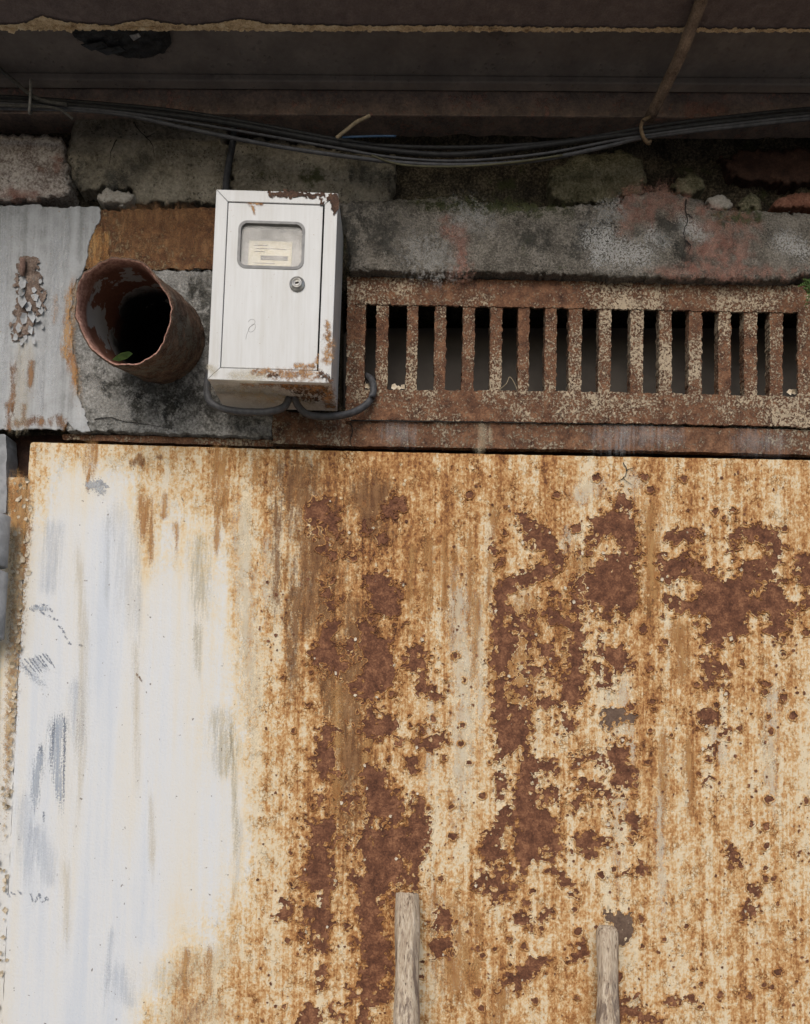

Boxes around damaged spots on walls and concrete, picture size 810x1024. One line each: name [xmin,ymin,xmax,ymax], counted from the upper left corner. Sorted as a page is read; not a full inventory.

peeling [72,29,172,59]
rust [0,16,810,34]
rust [88,204,214,266]
crack [682,199,693,259]
peeling [9,256,47,346]
rust [54,284,78,390]
damp [85,366,217,429]
rust [242,320,336,408]
rust [252,455,408,842]
rust [404,498,557,718]
rust [633,703,722,830]
rust [420,873,505,1000]